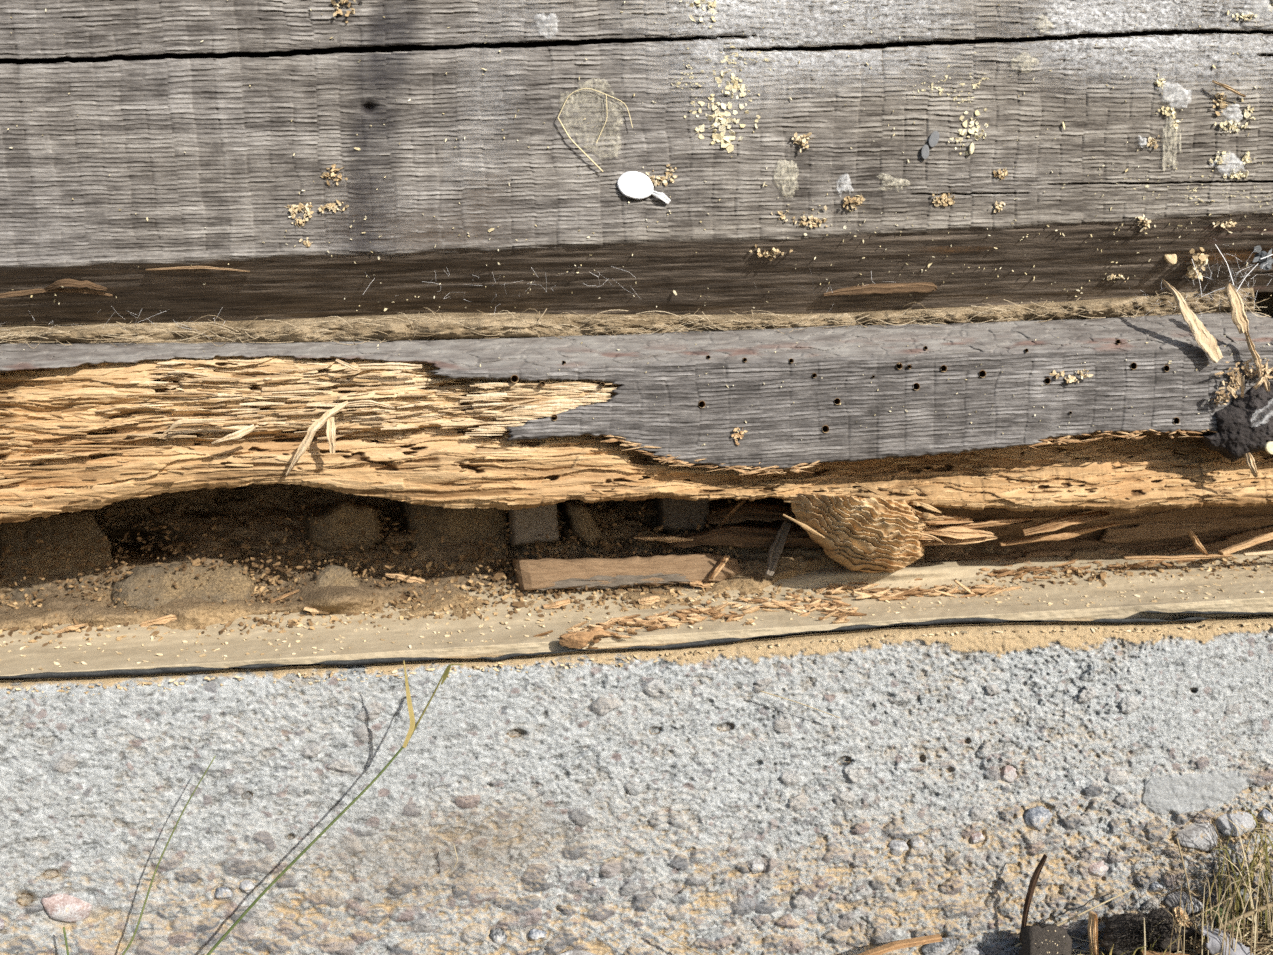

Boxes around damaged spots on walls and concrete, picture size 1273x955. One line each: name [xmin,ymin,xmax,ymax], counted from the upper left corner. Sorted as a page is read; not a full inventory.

crack [0,31,1273,63]
peeling [919,510,1120,546]